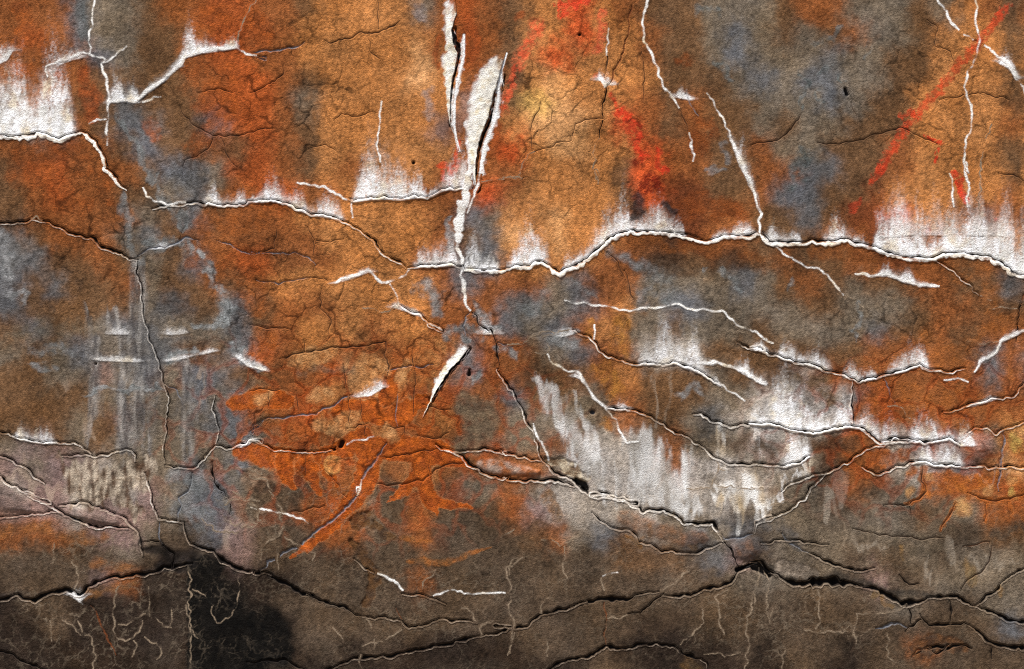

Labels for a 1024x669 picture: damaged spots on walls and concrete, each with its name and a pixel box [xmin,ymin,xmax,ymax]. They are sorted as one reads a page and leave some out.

crack [0,0,305,191]
damp [0,0,573,669]
rust [223,339,476,559]
rust [398,533,493,569]
peeling [422,343,509,462]
peeling [440,0,506,188]
crack [0,214,1024,669]
crack [141,0,1024,492]
damp [383,142,1024,603]
damp [703,116,1024,289]